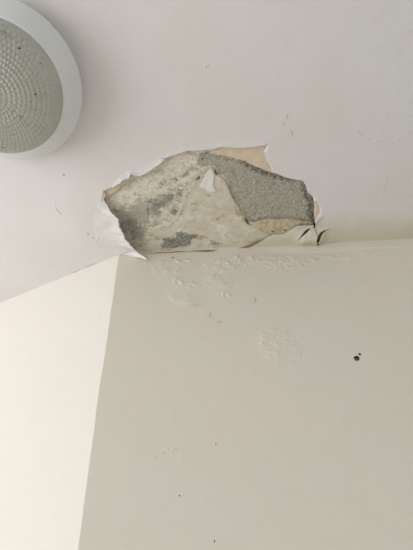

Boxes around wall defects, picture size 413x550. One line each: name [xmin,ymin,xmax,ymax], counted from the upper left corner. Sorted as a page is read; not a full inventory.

flaking render [92,141,320,260]